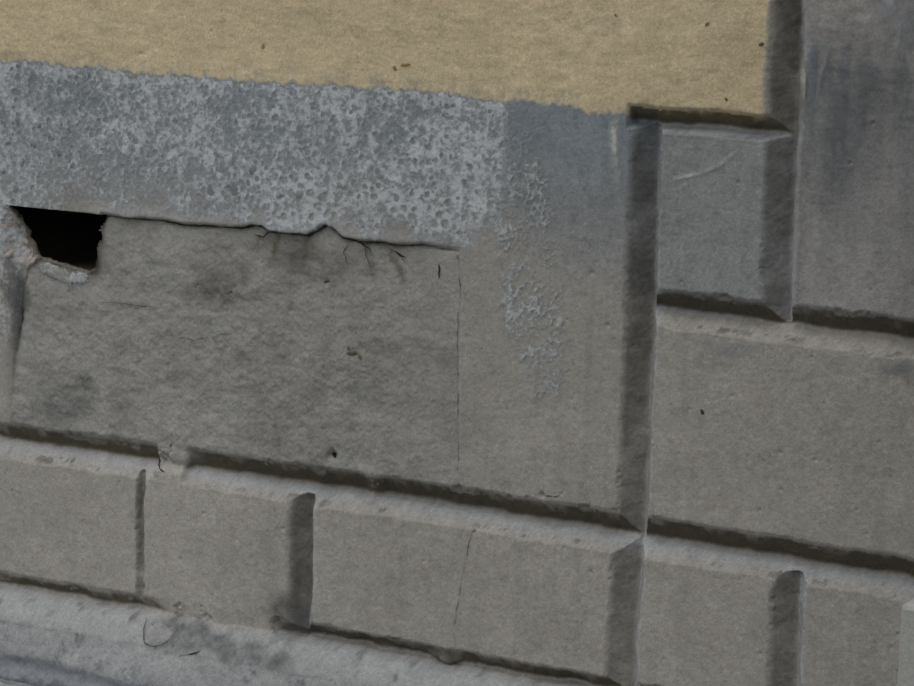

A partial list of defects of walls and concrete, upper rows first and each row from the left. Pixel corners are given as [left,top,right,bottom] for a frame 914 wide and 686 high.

peeling [0,60,509,352]
crack [106,201,461,471]